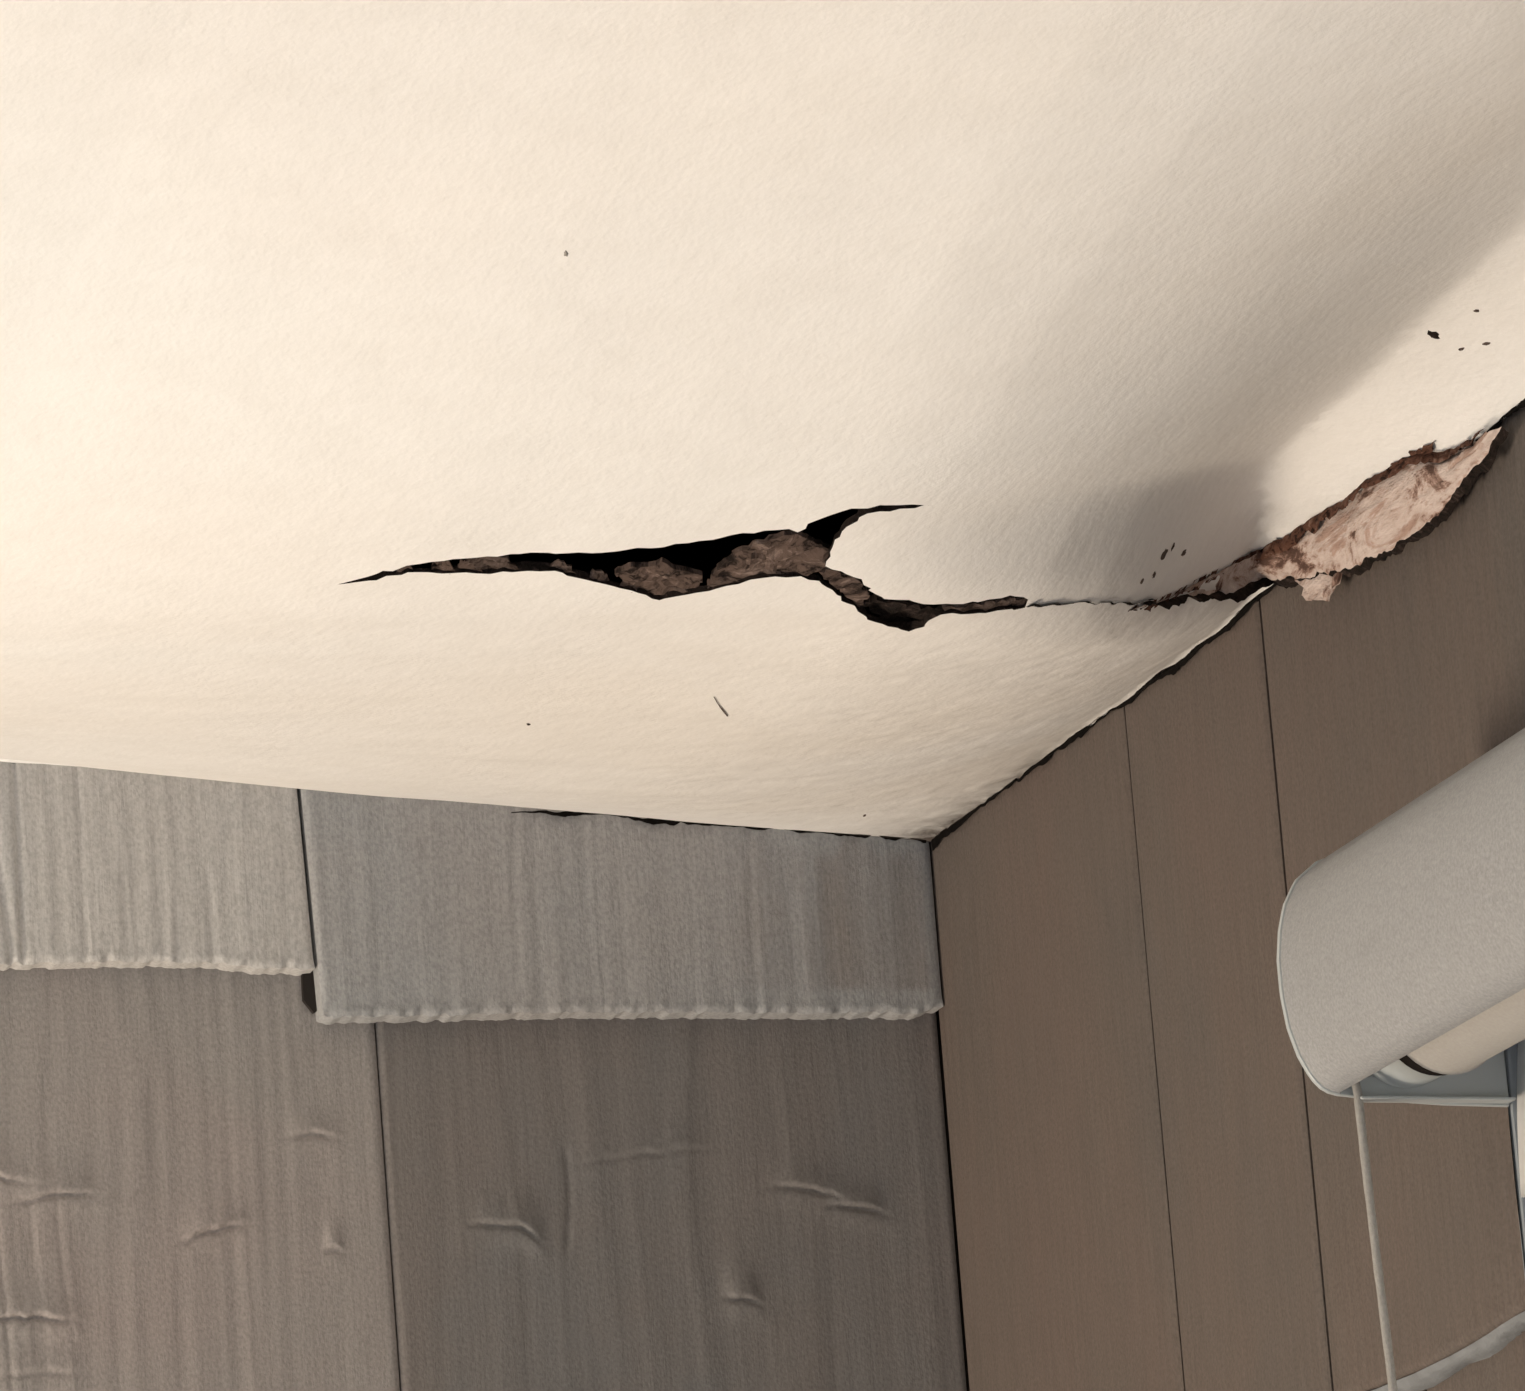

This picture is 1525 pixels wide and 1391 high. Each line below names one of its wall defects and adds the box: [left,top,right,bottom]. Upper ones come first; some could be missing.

crack [341,505,1155,631]
peeling [1129,427,1509,612]